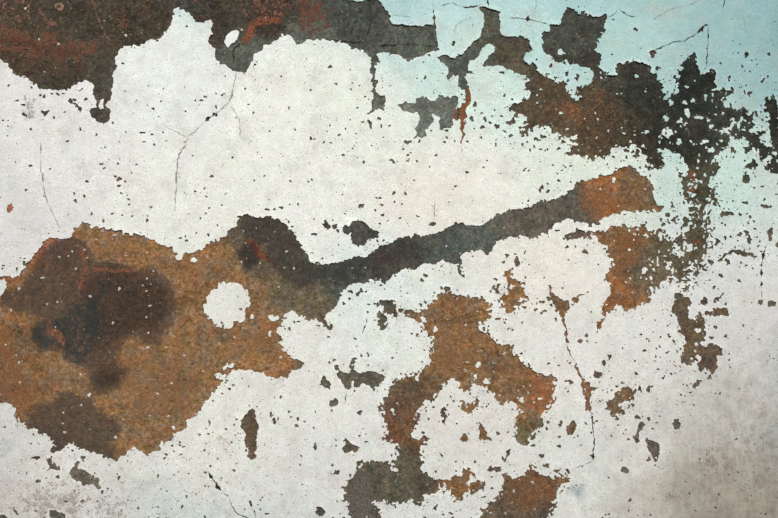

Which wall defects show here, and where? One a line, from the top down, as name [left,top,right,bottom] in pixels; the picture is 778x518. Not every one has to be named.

rust [0,0,97,63]
rust [236,0,332,44]
crack [648,24,709,67]
rust [453,87,471,144]
peeling [315,250,668,518]
crack [573,416,595,470]